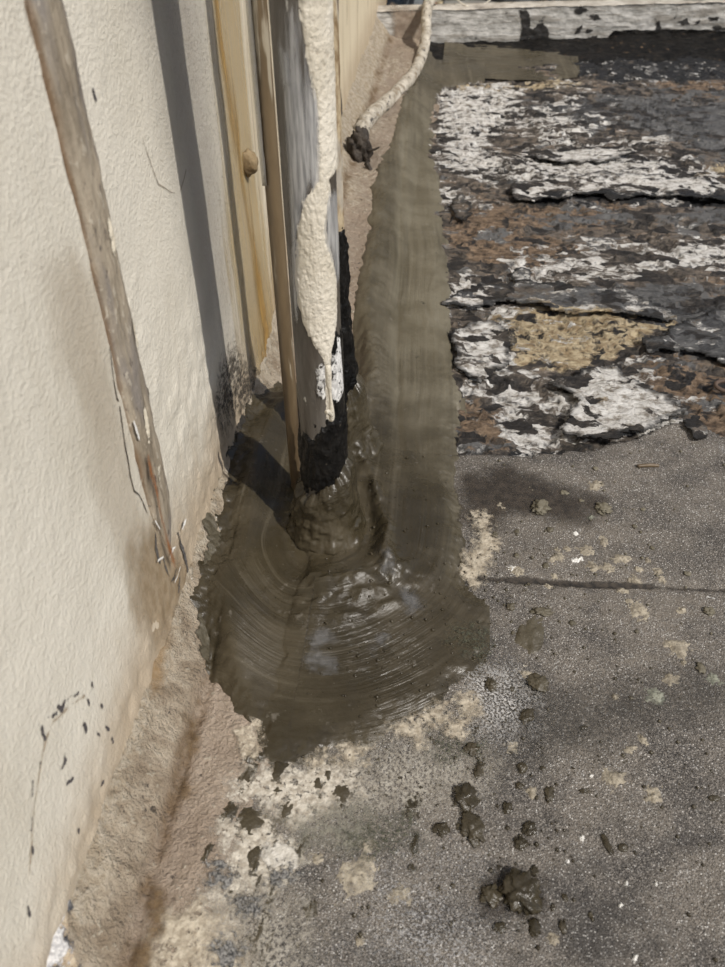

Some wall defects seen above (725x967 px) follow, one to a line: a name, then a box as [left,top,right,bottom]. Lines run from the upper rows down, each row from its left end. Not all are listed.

leakage [215,0,273,457]
leakage [195,613,210,664]